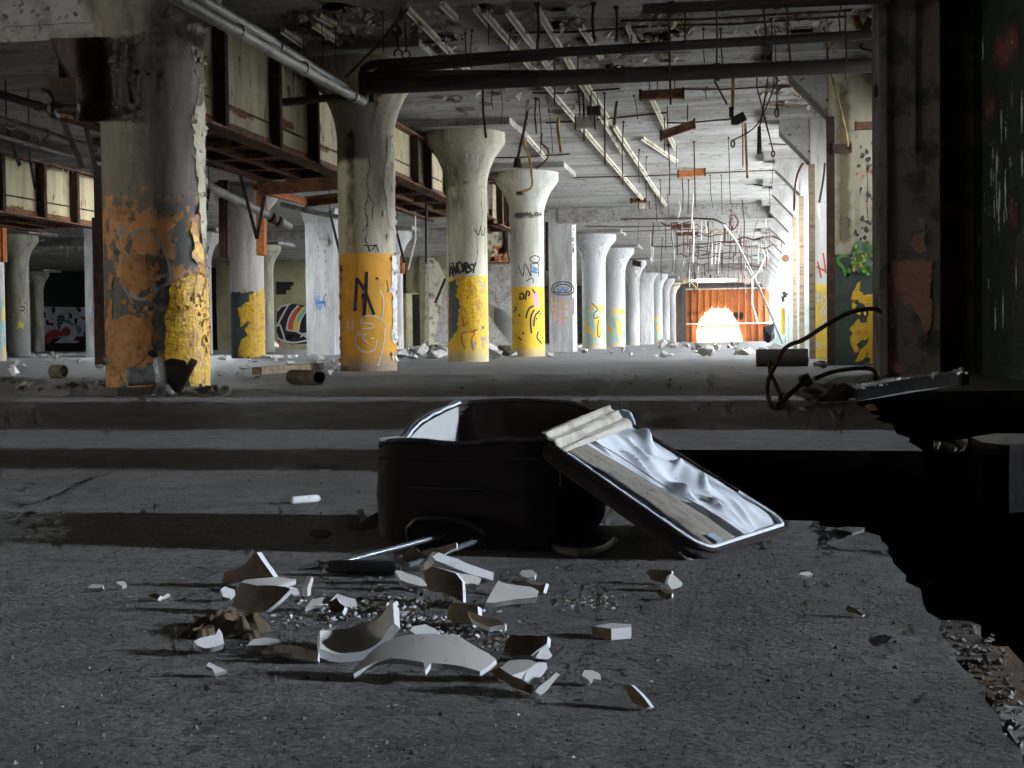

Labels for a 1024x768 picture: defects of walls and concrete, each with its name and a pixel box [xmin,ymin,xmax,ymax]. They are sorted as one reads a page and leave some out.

peeling [107,39,211,387]
crack [363,154,374,252]
peeling [856,142,872,202]
peeling [237,282,294,358]
peeling [448,275,485,342]
peeling [765,202,968,409]
spalling [873,635,893,645]